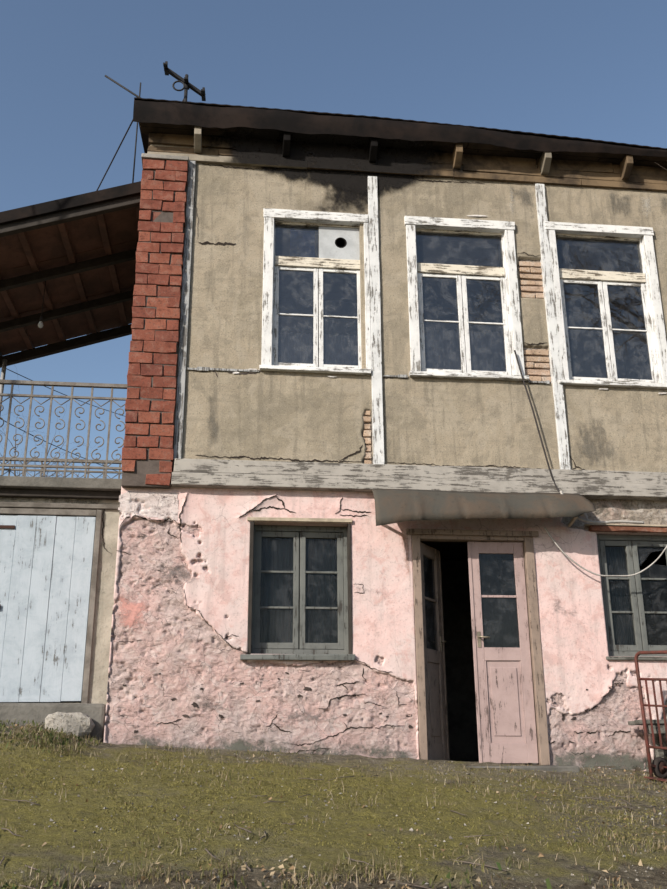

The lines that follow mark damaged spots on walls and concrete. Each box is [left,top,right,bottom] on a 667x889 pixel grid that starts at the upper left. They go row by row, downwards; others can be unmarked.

flaking render [517,259,544,299]
flaking render [523,347,551,383]
flaking render [362,410,373,464]
crack [239,495,295,518]
crack [335,497,369,517]
flaking render [561,499,667,531]
peeling [106,492,418,759]
crack [258,659,407,754]
peeling [546,665,667,769]